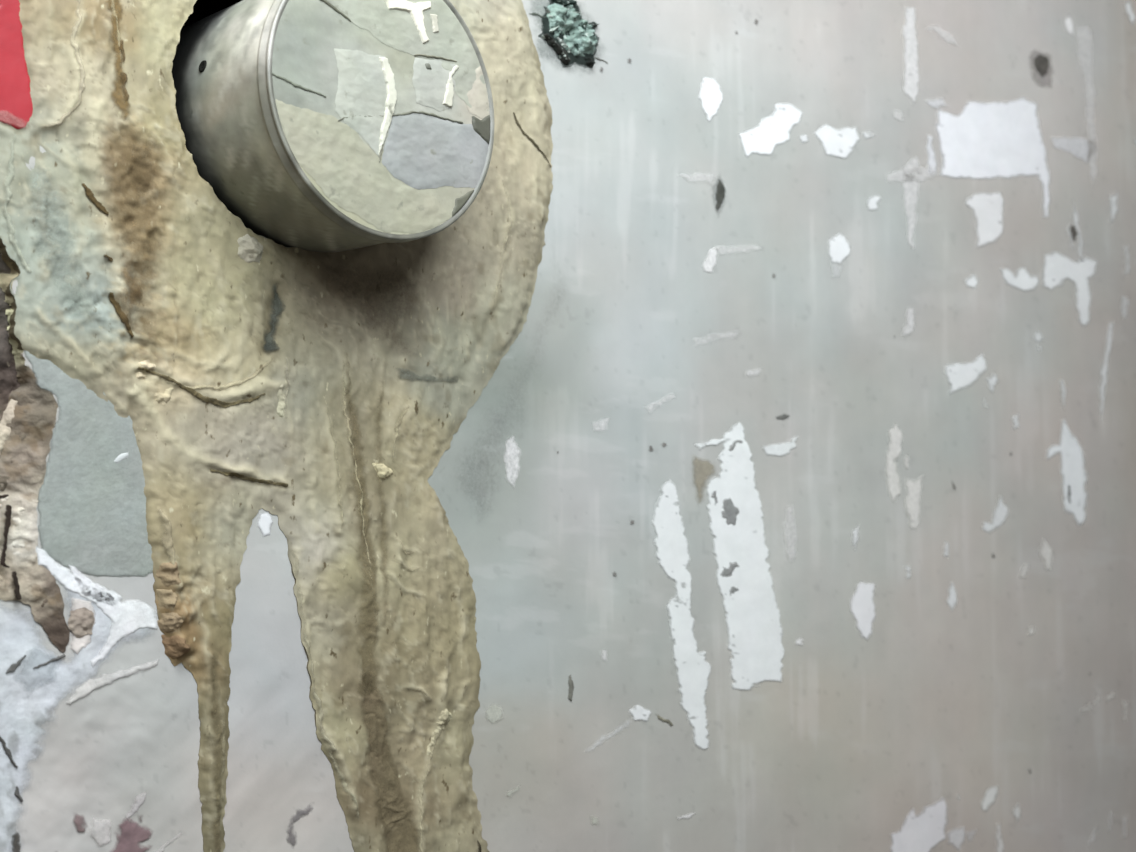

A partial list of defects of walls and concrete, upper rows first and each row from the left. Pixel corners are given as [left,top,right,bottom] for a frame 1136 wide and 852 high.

peeling [888,8,1096,247]
peeling [1000,210,1097,325]
peeling [1048,420,1087,525]
peeling [0,248,158,852]
peeling [696,423,803,690]
crack [6,654,66,674]
peeling [630,705,673,726]
peeling [653,481,711,749]
crack [0,736,23,802]
peeling [891,799,974,852]
peeling [981,786,998,811]